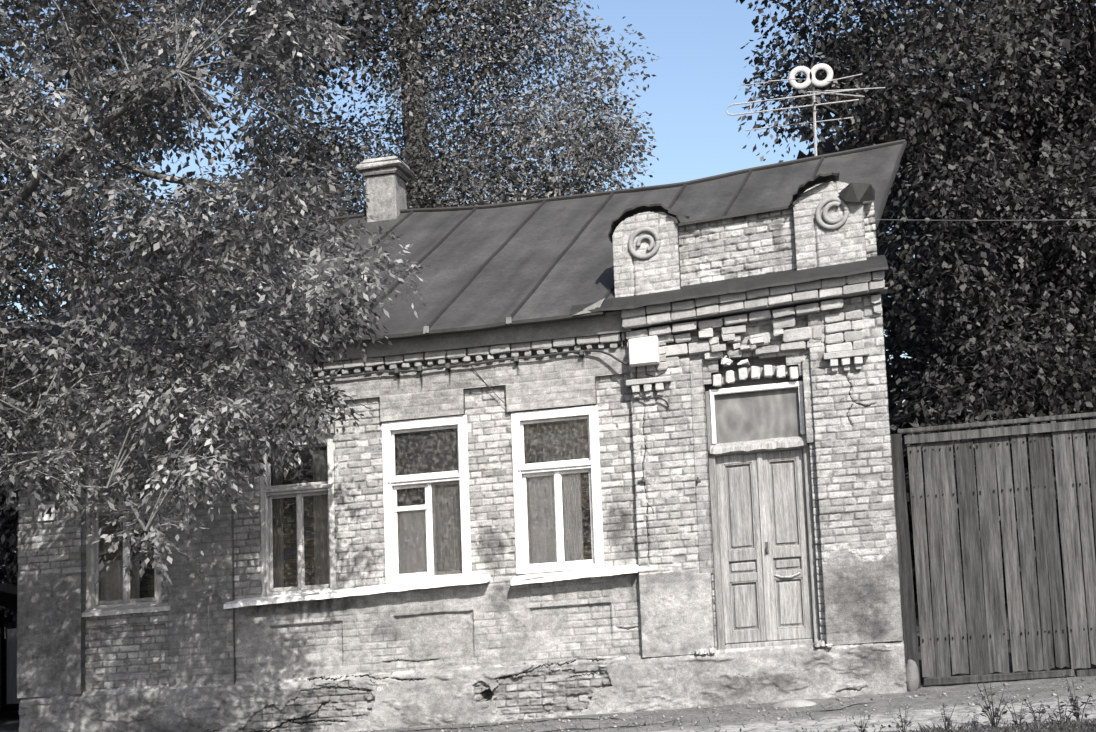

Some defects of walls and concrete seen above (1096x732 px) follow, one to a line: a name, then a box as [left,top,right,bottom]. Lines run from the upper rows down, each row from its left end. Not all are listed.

crack [840,376,872,423]
spalling [238,680,375,732]
spalling [473,659,614,719]